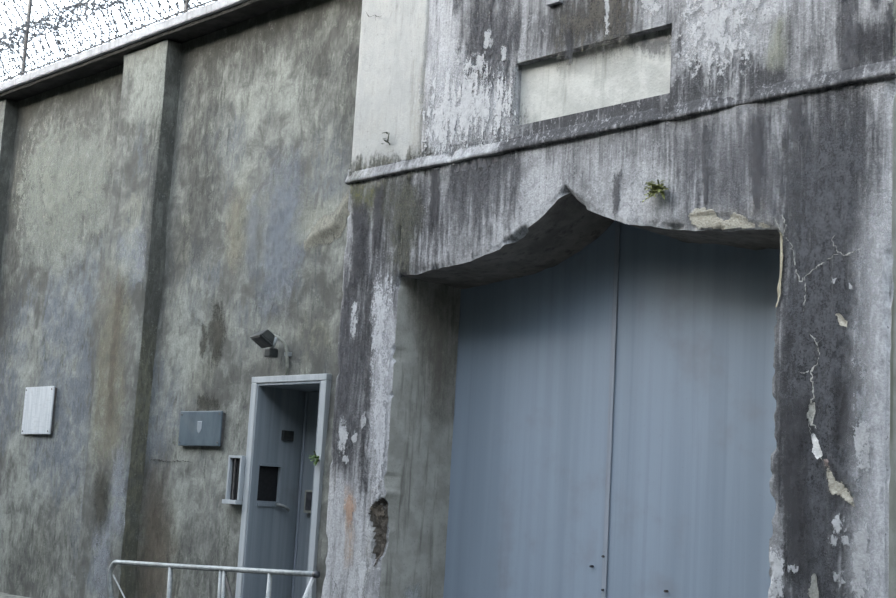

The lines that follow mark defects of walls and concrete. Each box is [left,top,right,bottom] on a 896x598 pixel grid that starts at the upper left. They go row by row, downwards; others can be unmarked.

peeling [420,30,517,158]
water stain [452,0,521,92]
water stain [836,0,896,71]
water stain [612,169,622,215]
water stain [333,113,529,504]
spalling [688,207,784,308]
water stain [667,82,880,598]
crack [775,215,863,311]
peeling [338,411,366,464]
peeling [807,226,889,598]
spalling [356,498,388,598]
peeling [769,545,799,598]